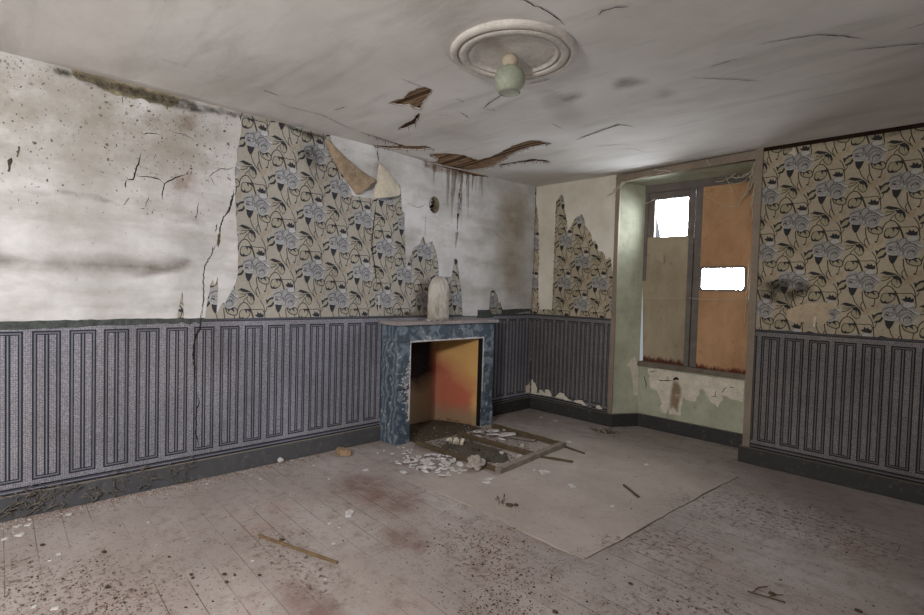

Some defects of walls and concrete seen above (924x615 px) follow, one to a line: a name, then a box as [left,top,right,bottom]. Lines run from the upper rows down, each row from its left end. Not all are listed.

crack [760,24,924,51]
flaking render [58,69,200,111]
damp [1,104,71,204]
damp [60,74,235,199]
crack [124,131,194,209]
crack [192,191,234,445]
flaking render [525,379,602,409]
flaking render [627,356,744,416]